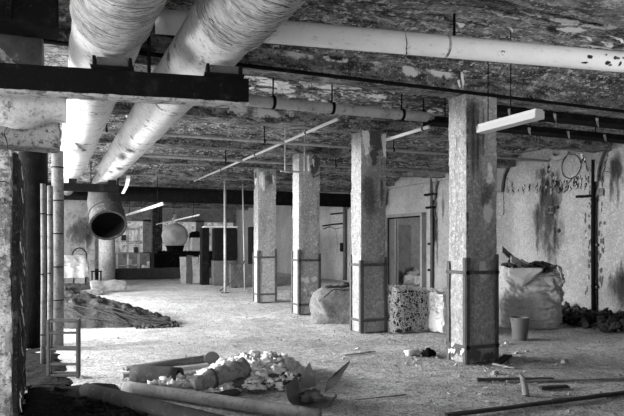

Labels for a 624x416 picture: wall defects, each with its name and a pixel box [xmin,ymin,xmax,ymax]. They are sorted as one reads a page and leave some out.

peeling [493,11,624,66]
peeling [244,76,407,108]
damp [611,160,622,176]
damp [483,200,493,223]
spalling [507,154,606,295]